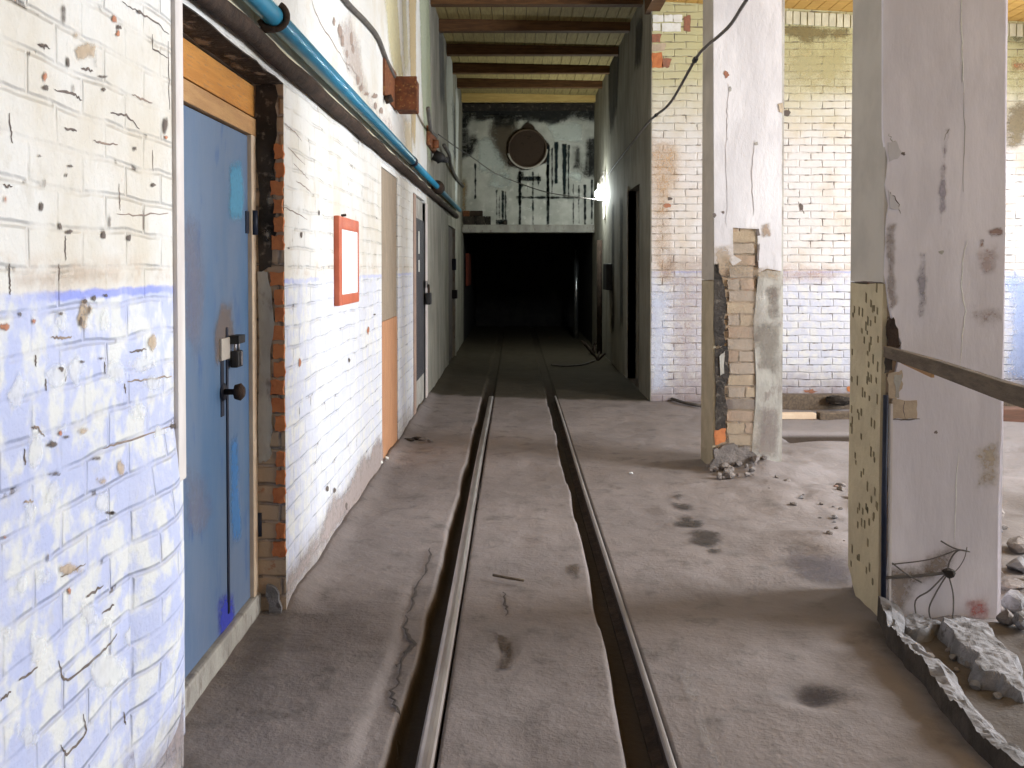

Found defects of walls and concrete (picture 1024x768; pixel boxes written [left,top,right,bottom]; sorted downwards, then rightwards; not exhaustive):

spalling [270,143,304,250]
damp [462,103,594,199]
damp [496,138,594,225]
flaking render [51,294,108,340]
spalling [270,272,286,432]
flaking render [713,224,770,451]
spalling [884,317,920,420]
peeling [103,424,175,449]
spalling [272,451,287,504]
spalling [272,523,287,558]
crack [389,548,432,760]
damp [799,687,836,705]